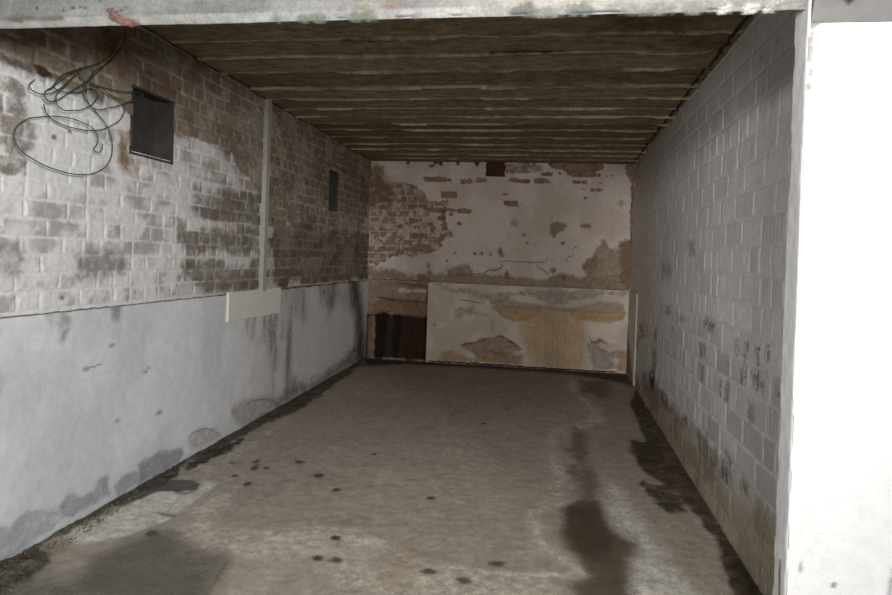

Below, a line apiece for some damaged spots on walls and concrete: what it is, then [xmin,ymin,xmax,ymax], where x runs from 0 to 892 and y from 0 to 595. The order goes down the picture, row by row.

peeling [0,7,613,361]
peeling [583,164,635,290]
water stain [264,282,435,405]
water stain [59,381,702,595]
water stain [367,267,731,506]